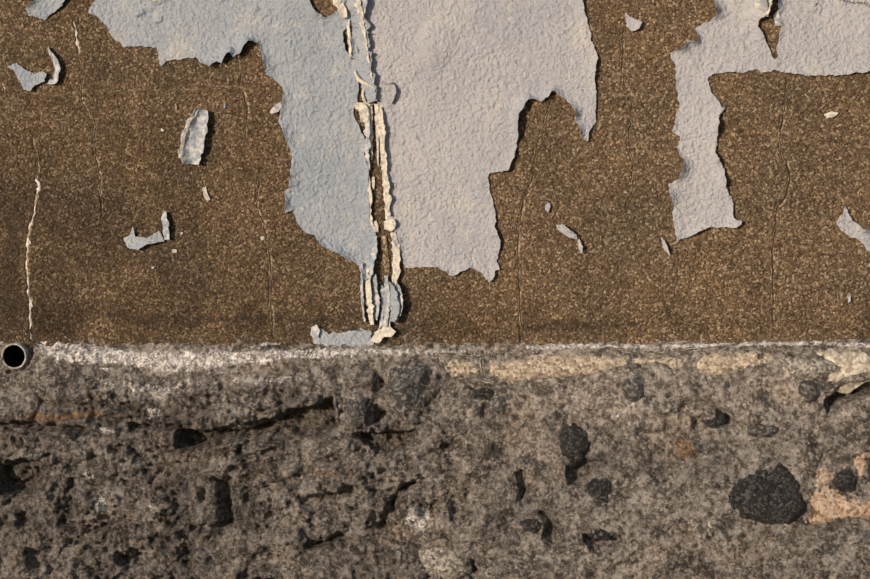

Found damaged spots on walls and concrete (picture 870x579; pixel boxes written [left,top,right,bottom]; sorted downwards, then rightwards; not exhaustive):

crack [25,131,41,340]
peeling [7,47,61,91]
peeling [26,0,65,20]
crack [0,19,273,217]
crack [255,169,275,337]
peeling [310,325,374,347]
peeling [88,0,598,282]
crack [440,100,553,392]
peeling [625,13,642,31]
peeling [661,0,870,256]
crack [770,78,816,326]